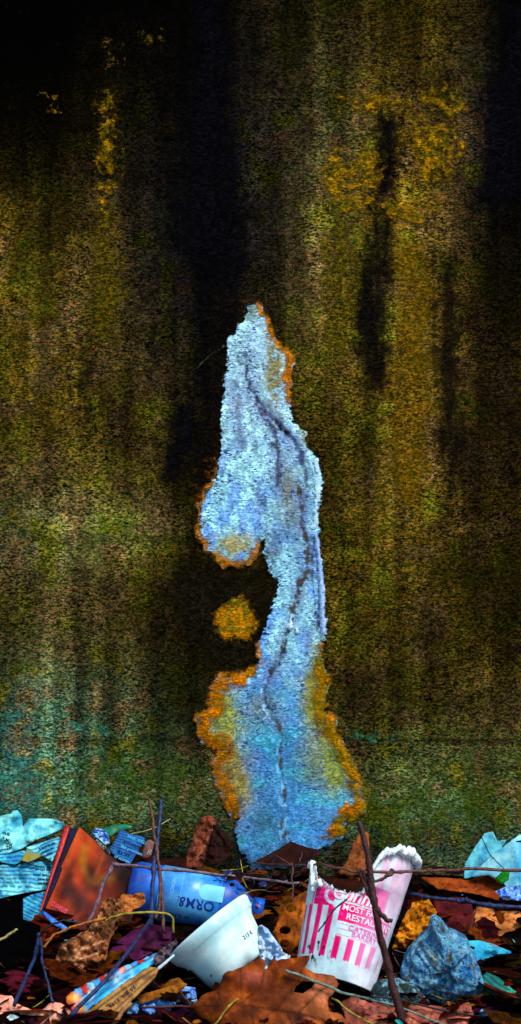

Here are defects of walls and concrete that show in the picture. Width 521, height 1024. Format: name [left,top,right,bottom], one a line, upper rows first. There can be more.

leakage [352,111,404,389]
rust [194,596,265,818]
crack [197,345,320,844]